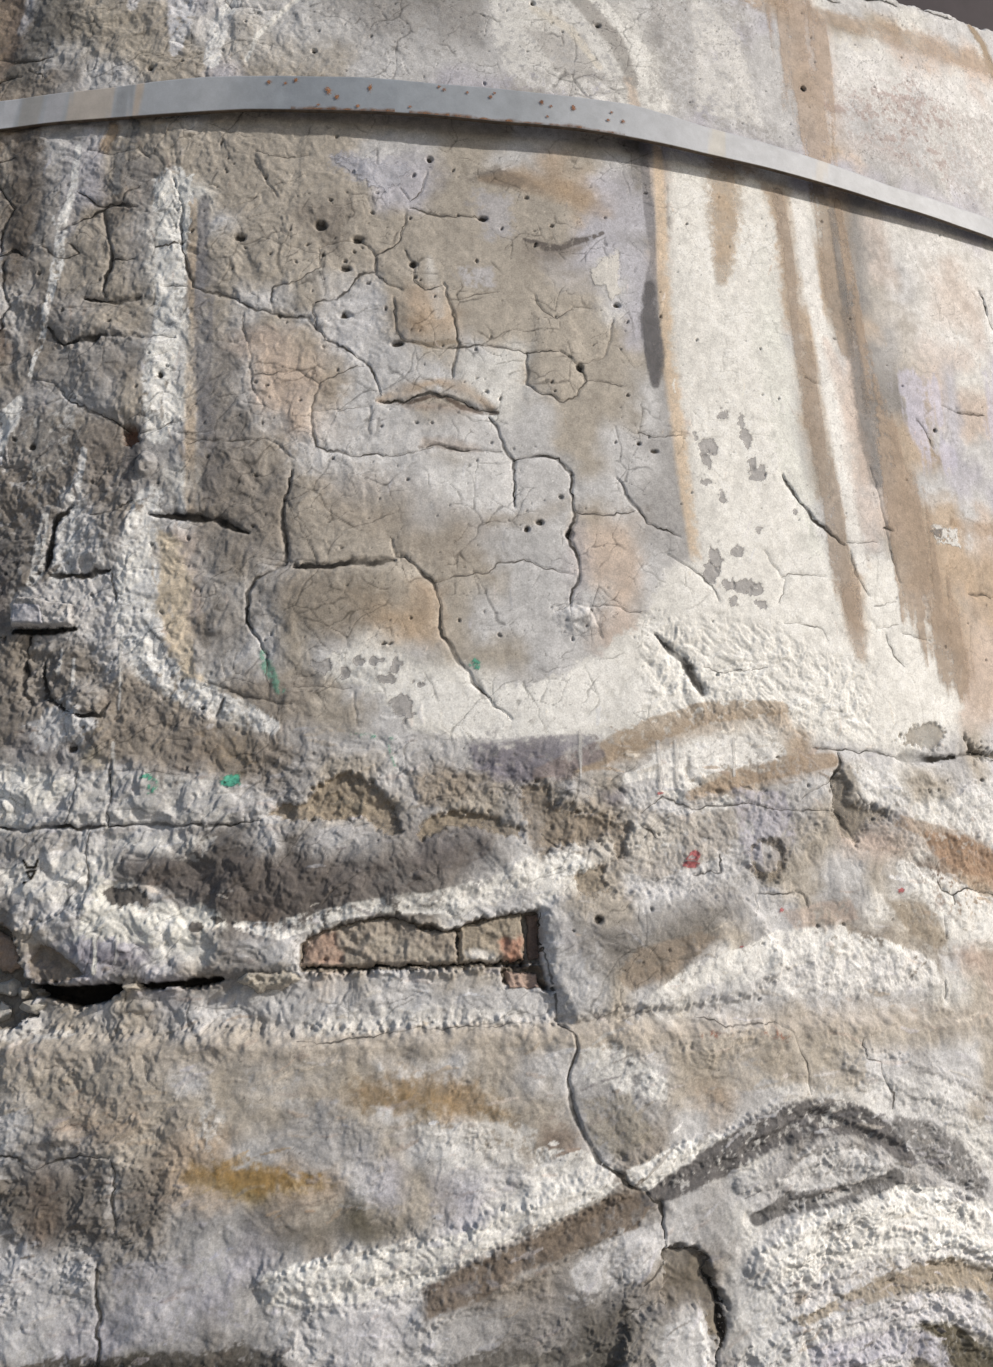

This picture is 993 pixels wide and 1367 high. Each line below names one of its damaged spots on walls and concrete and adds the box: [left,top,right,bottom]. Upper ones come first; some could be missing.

corrosion [291,87,625,133]
leakage [642,282,664,387]
crack [0,157,675,719]
peeling [693,432,727,503]
peeling [717,407,766,481]
peeling [703,544,767,609]
crack [630,611,767,696]
crack [643,748,993,839]
spalling [0,927,83,1029]
spalling [237,912,547,994]
crack [537,913,578,1115]
crack [595,1155,727,1367]